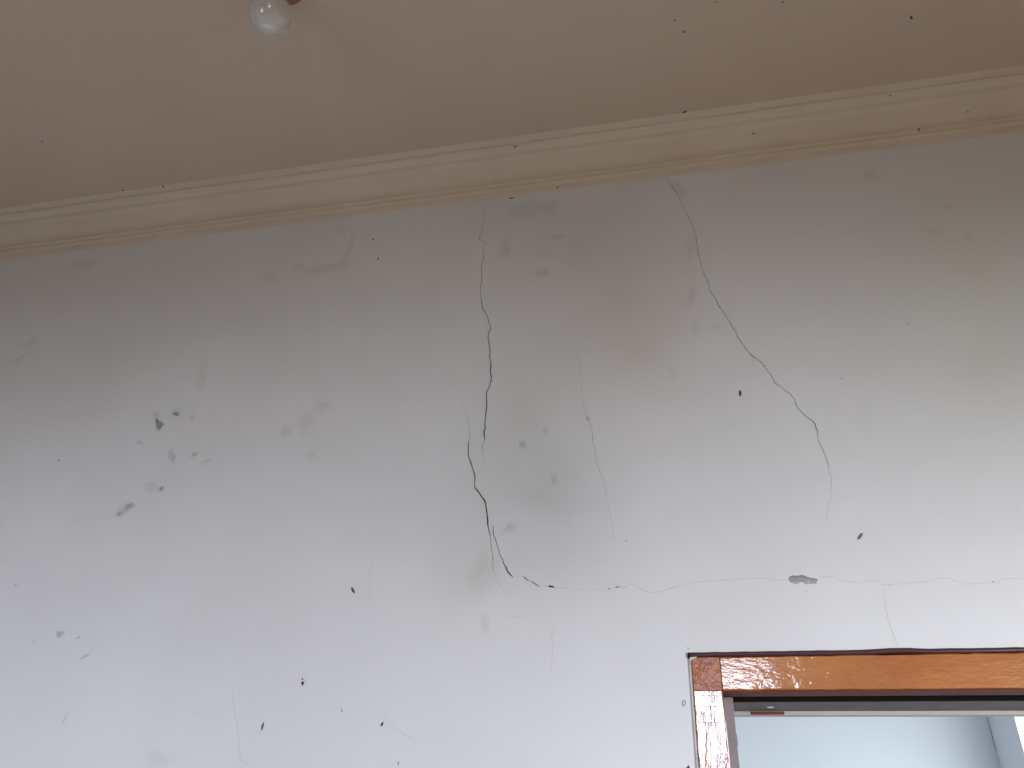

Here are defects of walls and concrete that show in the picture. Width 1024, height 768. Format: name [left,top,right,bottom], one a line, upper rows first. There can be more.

crack [468,221,538,586]
flaking render [789,575,818,585]